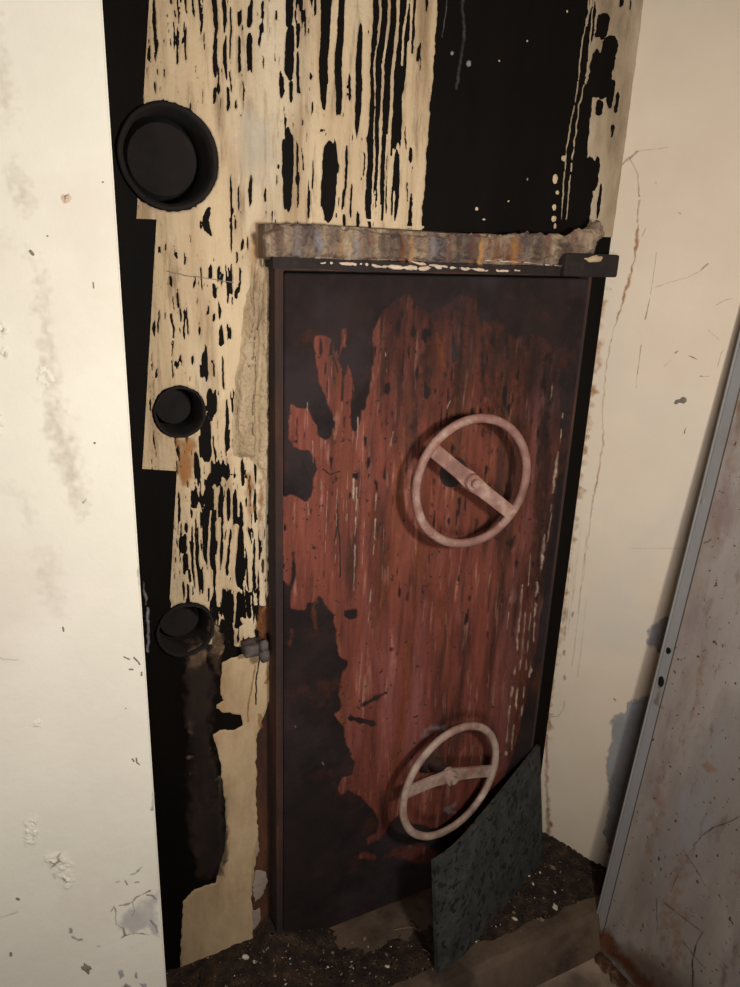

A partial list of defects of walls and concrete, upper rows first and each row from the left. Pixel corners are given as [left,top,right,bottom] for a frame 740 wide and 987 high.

peeling [142,0,644,477]
peeling [180,644,269,967]
rust [248,660,269,727]
peeling [283,318,536,858]